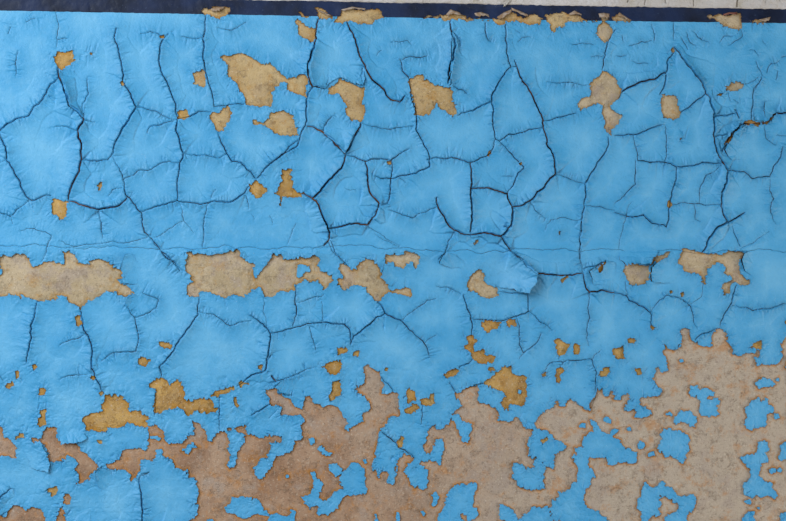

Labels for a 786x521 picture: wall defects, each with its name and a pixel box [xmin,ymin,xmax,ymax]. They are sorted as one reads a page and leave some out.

peeling [201,6,230,20]
peeling [423,8,631,43]
peeling [707,12,742,31]
peeling [220,53,308,137]
peeling [326,67,365,122]
peeling [408,74,457,117]
peeling [578,71,622,135]
crack [0,0,786,415]
peeling [0,250,142,326]
peeling [185,249,420,301]
peeling [619,248,754,297]
peeling [0,328,786,521]